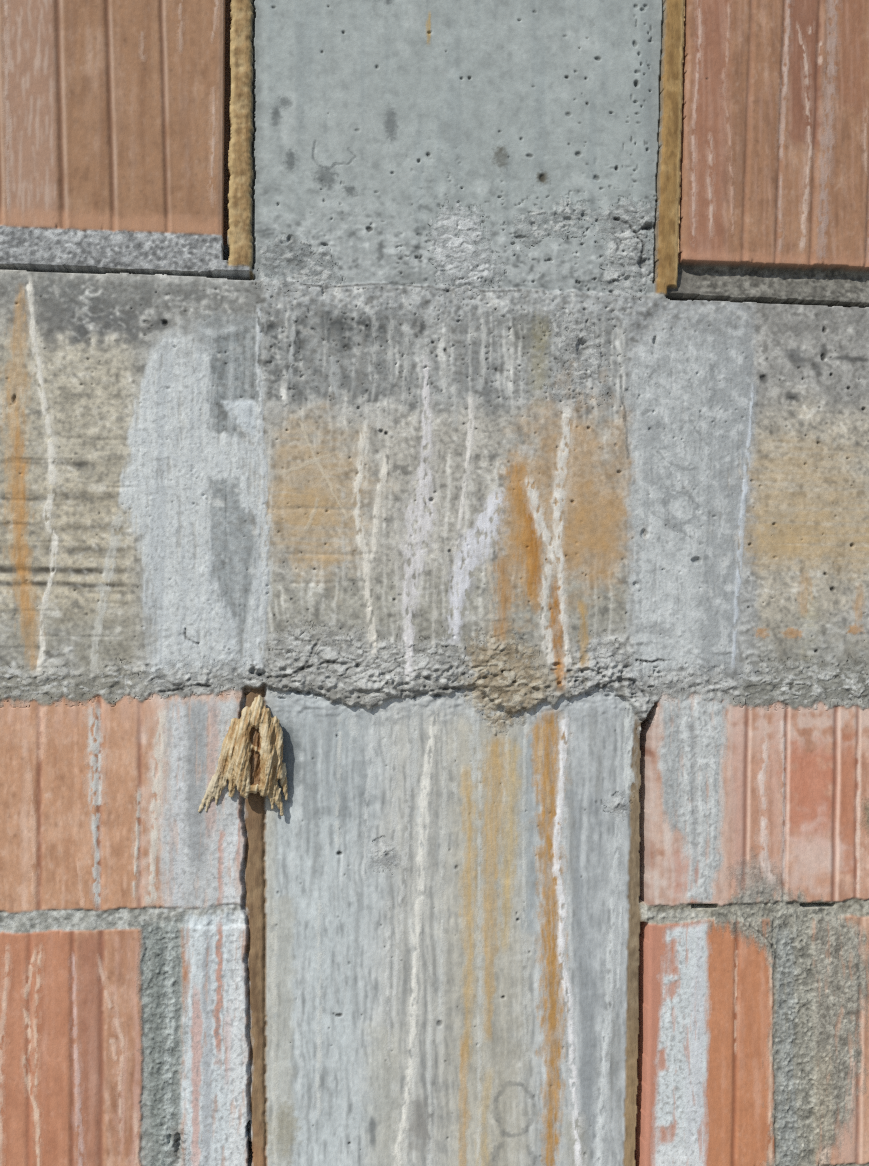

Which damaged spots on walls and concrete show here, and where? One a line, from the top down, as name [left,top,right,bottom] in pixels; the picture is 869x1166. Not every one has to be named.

rust [0,281,46,674]
leakage [267,308,632,691]
rust [457,457,593,1166]